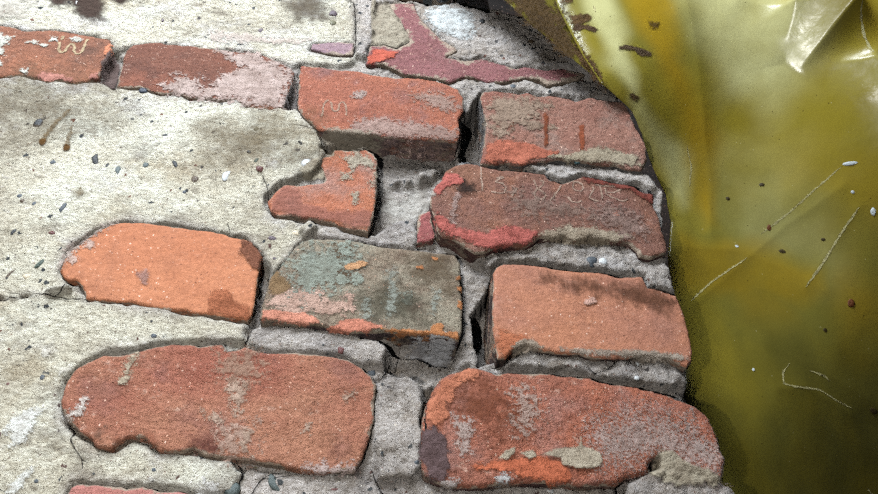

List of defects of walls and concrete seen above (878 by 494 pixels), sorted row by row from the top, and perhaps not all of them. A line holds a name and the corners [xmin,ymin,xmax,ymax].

damp [0,0,37,19]
damp [51,0,106,21]
crack [0,282,120,304]